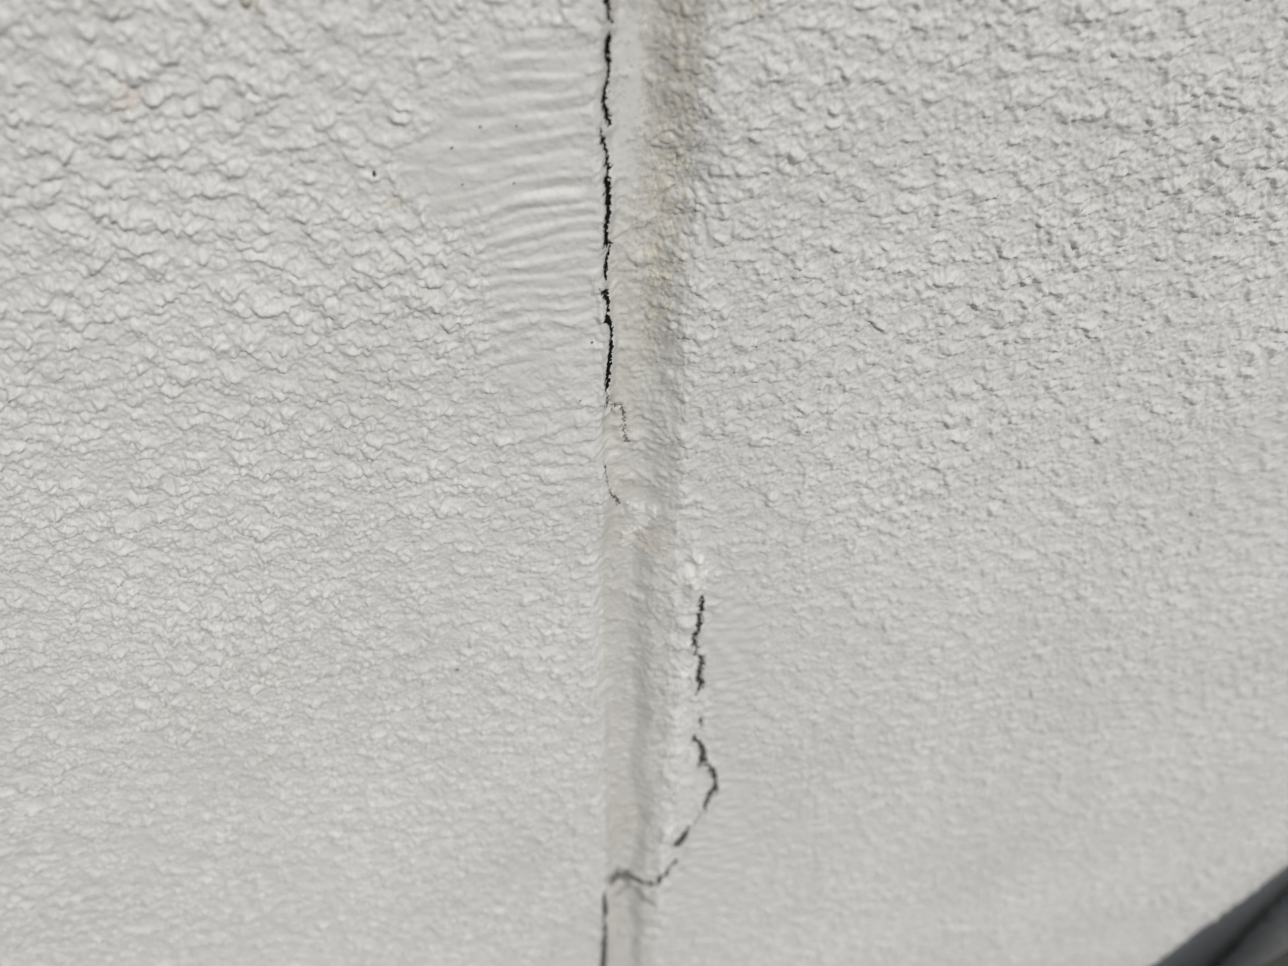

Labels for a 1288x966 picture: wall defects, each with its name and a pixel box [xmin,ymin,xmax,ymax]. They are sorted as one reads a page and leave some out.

crack [598,0,630,504]
crack [635,595,719,887]
crack [600,892,609,966]